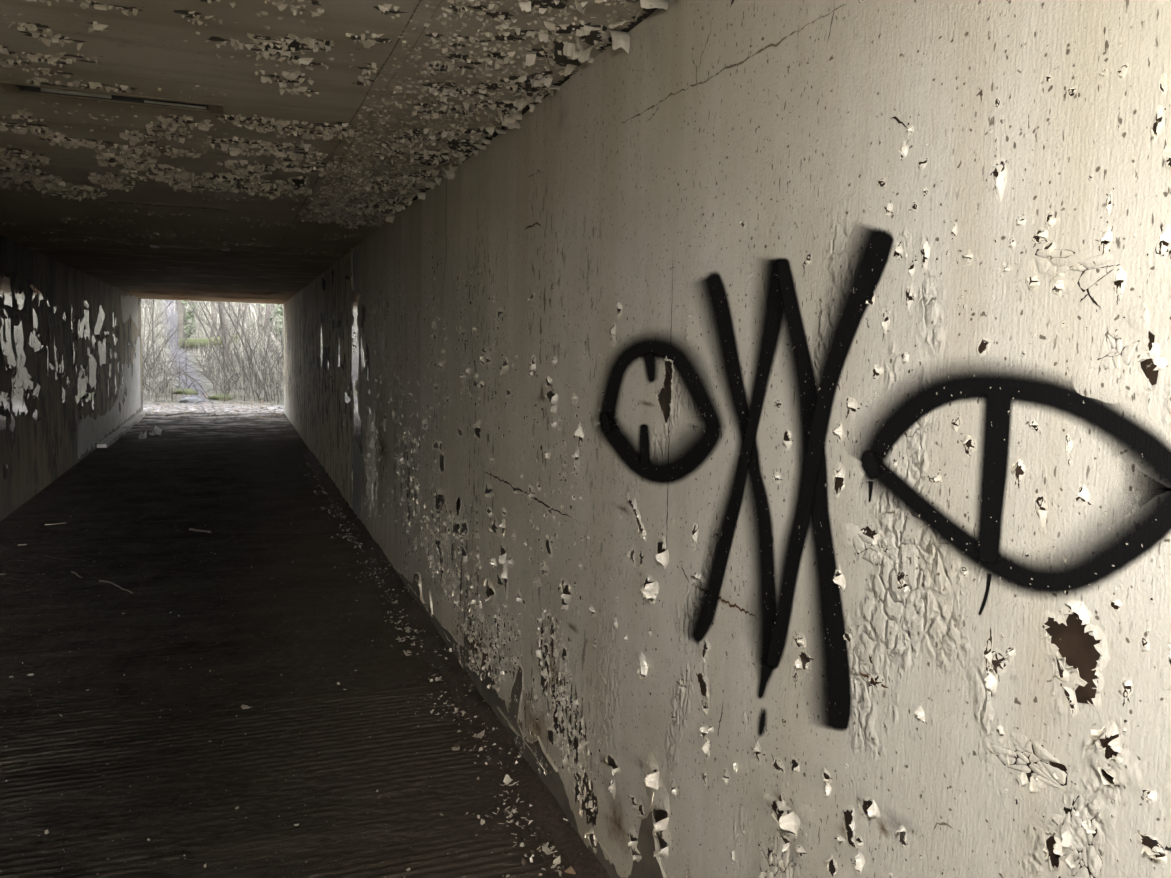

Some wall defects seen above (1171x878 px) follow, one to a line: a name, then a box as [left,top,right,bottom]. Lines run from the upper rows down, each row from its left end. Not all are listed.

crack [598,8,658,53]
crack [394,71,577,301]
peeling [963,338,998,360]
peeling [1138,331,1168,390]
peeling [0,0,676,878]
crack [480,470,577,521]
peeling [696,638,711,699]
peeling [1038,591,1110,718]
peeling [987,731,1079,792]
peeling [766,772,790,817]
peeling [759,837,789,878]
peeling [1042,793,1105,878]